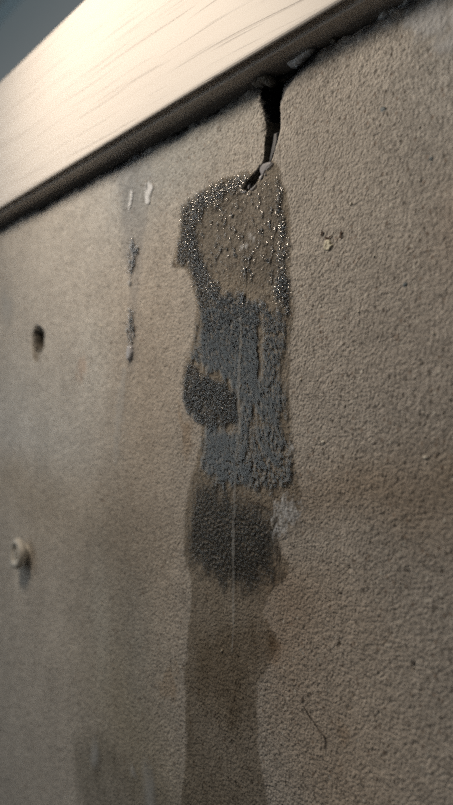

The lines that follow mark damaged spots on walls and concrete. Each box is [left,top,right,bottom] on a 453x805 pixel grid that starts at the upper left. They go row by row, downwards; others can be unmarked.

crack [210,71,297,214]